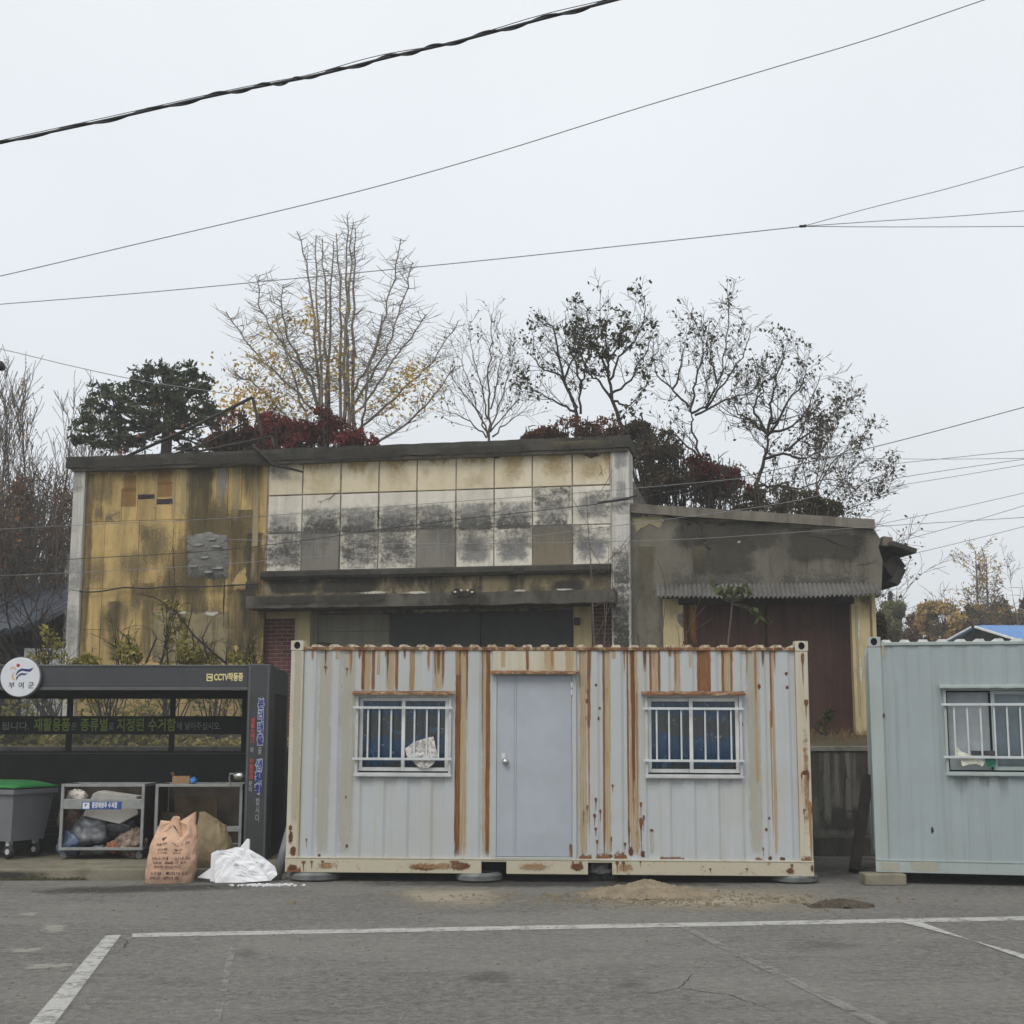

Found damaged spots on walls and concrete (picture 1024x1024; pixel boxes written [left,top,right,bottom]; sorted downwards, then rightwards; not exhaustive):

leakage [66,457,165,650]
leakage [100,453,655,660]
leakage [432,445,526,467]
leakage [669,517,778,586]
leakage [778,528,873,637]
rust [312,650,470,871]
rust [545,605,733,872]